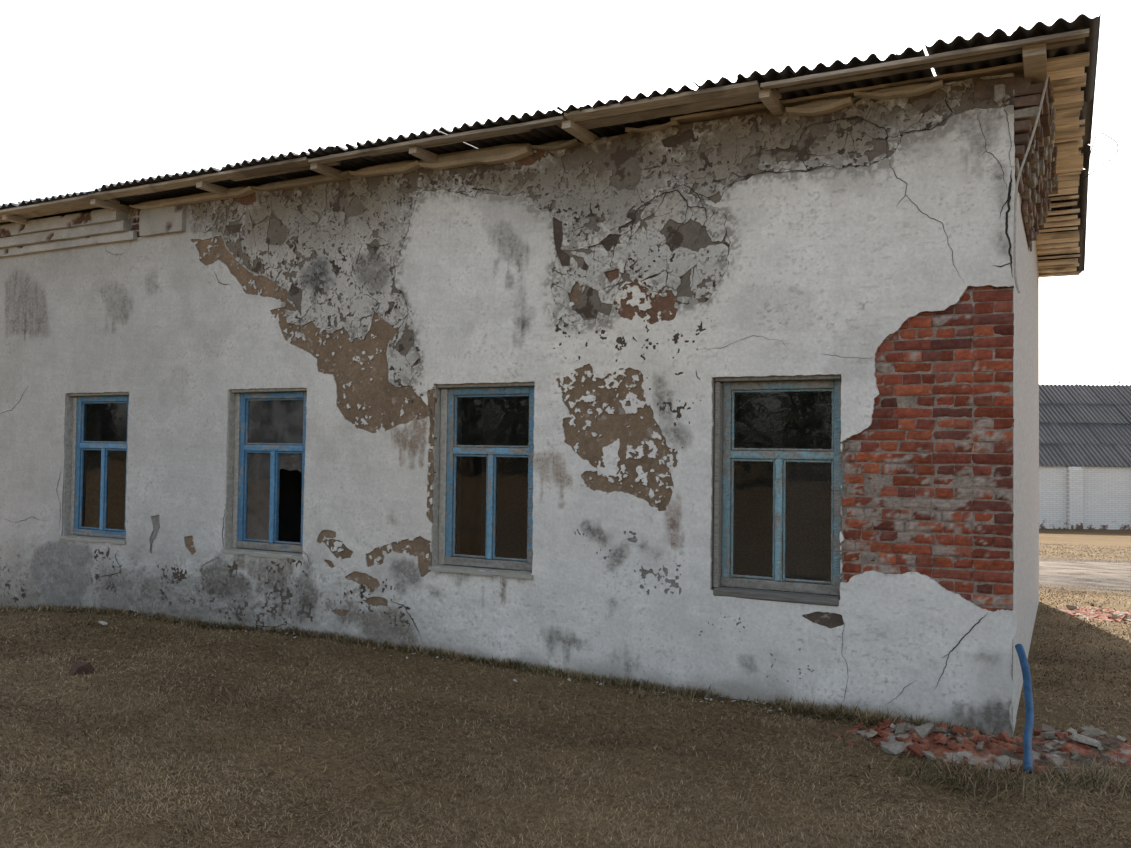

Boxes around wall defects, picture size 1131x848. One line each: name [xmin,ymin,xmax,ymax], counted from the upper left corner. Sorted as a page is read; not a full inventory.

peeling [191,78,1014,523]
crack [583,165,837,294]
crack [798,92,1013,282]
flaking render [842,285,1014,612]
peeling [317,528,432,631]
crack [887,614,987,704]